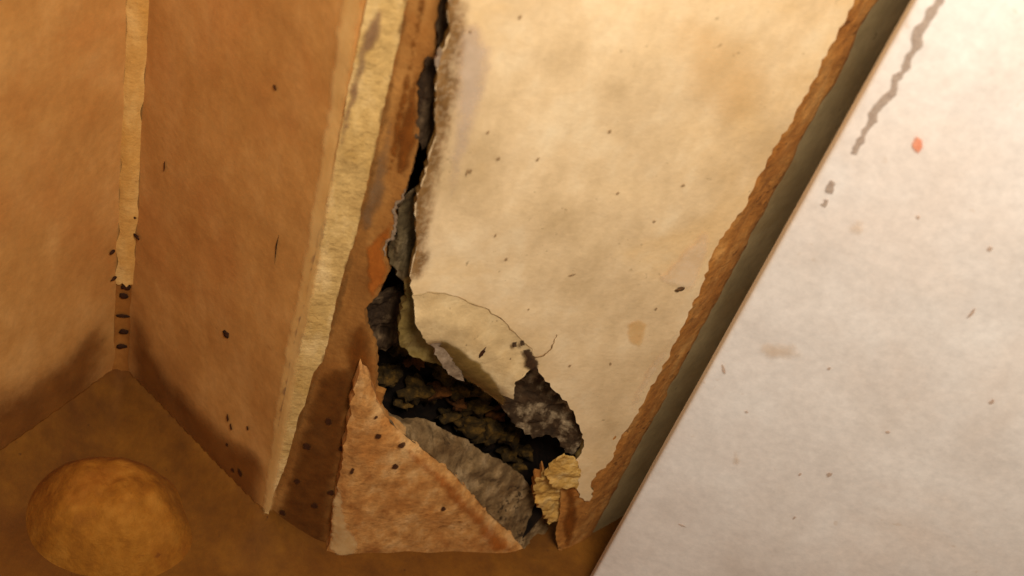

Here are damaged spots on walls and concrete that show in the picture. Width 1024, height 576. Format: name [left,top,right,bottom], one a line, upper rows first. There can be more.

damp [380,81,409,156]
crack [414,0,449,150]
damp [410,0,482,278]
damp [913,138,923,152]
crack [383,182,557,358]
spalling [366,0,878,550]
peeling [331,493,357,555]